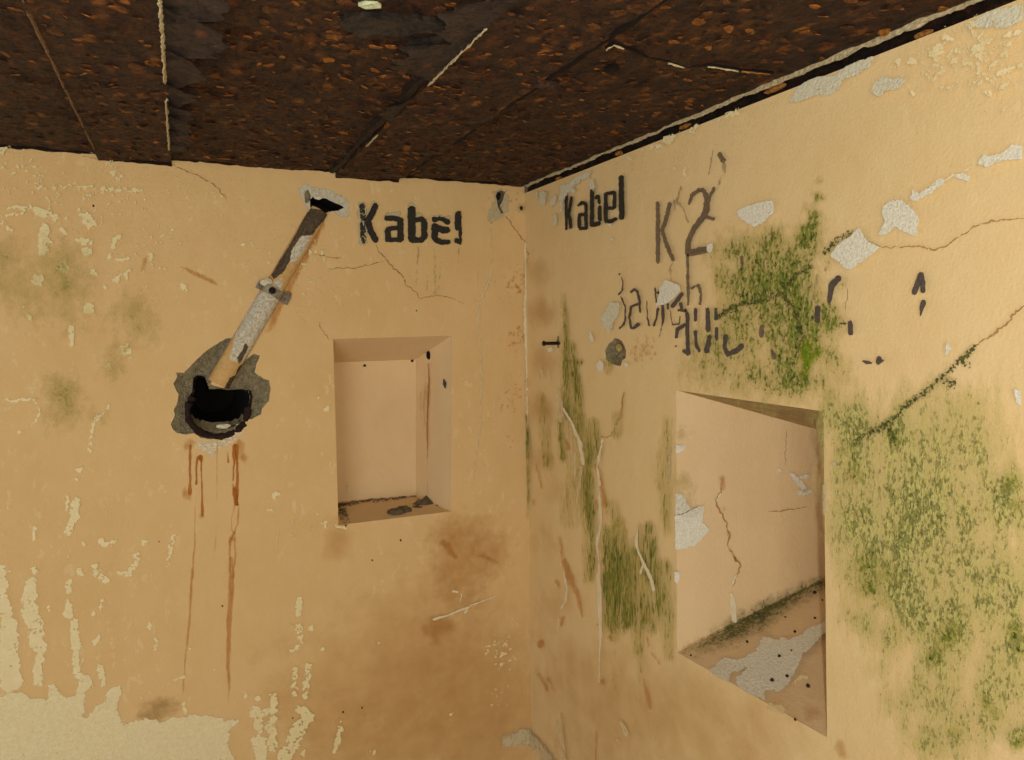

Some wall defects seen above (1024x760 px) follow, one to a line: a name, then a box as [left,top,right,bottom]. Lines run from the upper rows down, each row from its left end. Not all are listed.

peeling [790,56,874,103]
peeling [871,4,1024,118]
peeling [831,145,1023,270]
crack [318,246,459,302]
crack [715,218,1024,358]
corrosion [188,445,204,517]
corrosion [228,444,244,506]
damp [540,369,604,683]
damp [635,528,655,592]
crack [673,479,741,623]
peeling [0,540,315,760]
peeling [708,620,826,714]